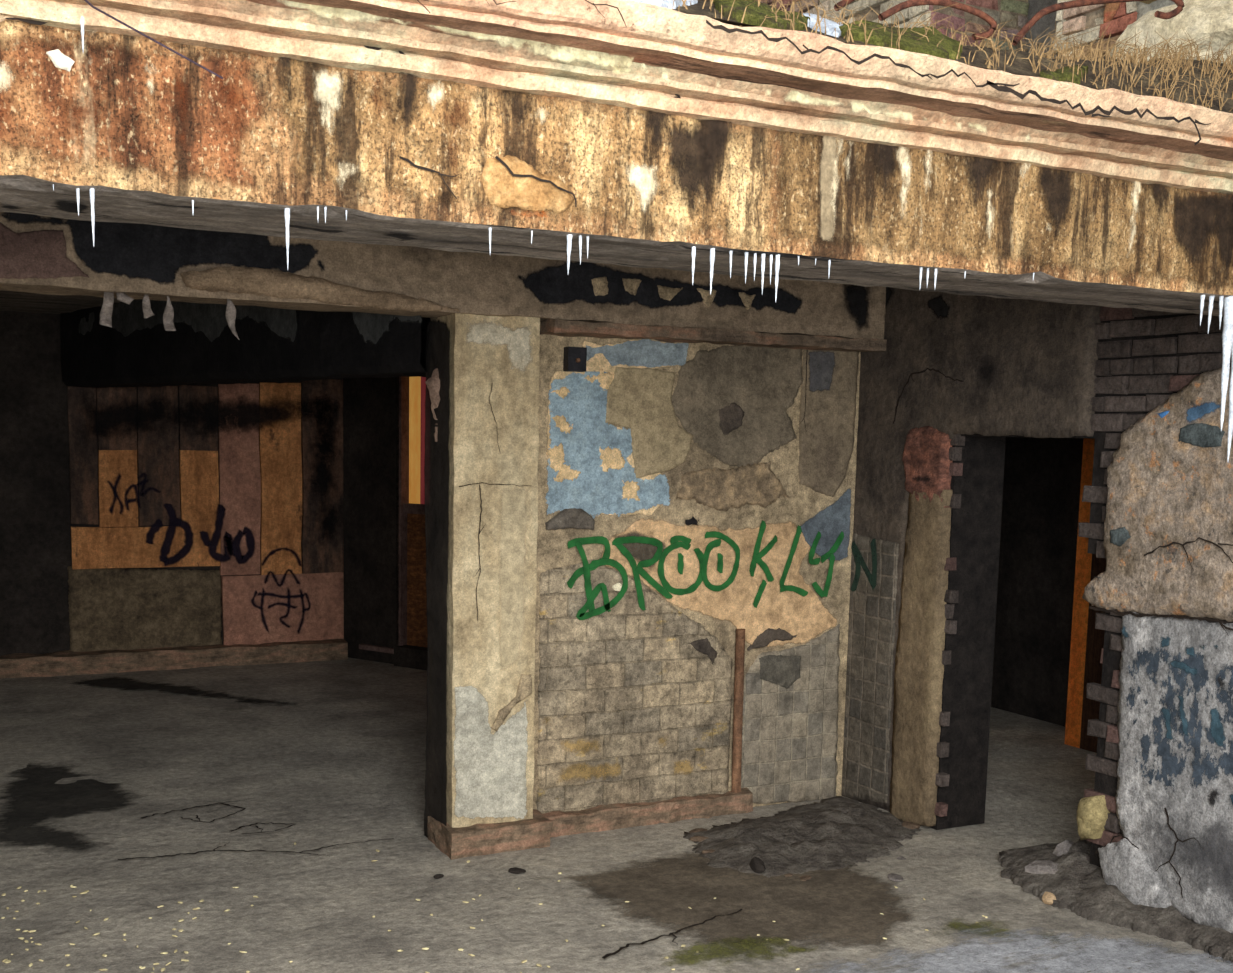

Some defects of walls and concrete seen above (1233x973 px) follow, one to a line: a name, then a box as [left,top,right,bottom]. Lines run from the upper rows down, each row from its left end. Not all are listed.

rust [0,39,263,186]
water stain [285,0,403,24]
water stain [432,25,645,74]
rust [277,57,1233,288]
water stain [820,135,837,240]
crack [706,20,1211,145]
peeling [0,212,459,345]
peeling [518,261,803,314]
peeling [545,339,851,689]
peeling [1121,637,1233,792]
water stain [0,764,132,850]
water stain [567,854,910,947]